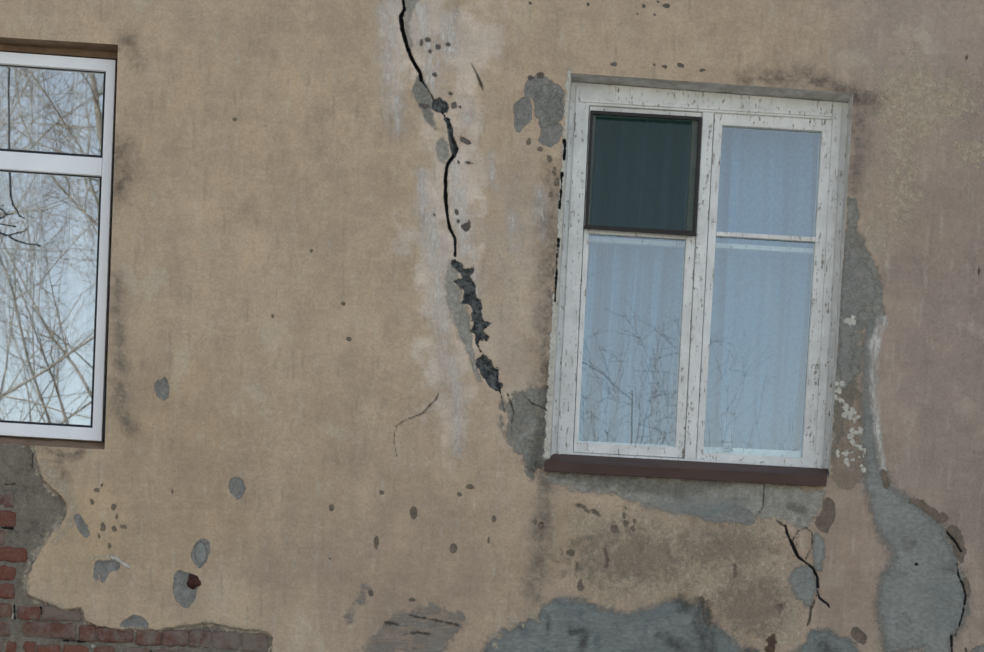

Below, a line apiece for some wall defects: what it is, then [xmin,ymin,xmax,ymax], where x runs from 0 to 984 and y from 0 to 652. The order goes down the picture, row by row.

crack [381,0,505,456]
flaking render [513,69,572,459]
flaking render [154,377,169,400]
flaking render [74,504,130,583]
flaking render [173,539,210,608]
flaking render [229,477,246,499]
crack [756,485,830,626]
flaking render [815,497,835,533]
flaking render [908,499,966,563]
crack [946,531,967,652]
flaking render [765,634,777,652]
flaking render [851,627,867,644]